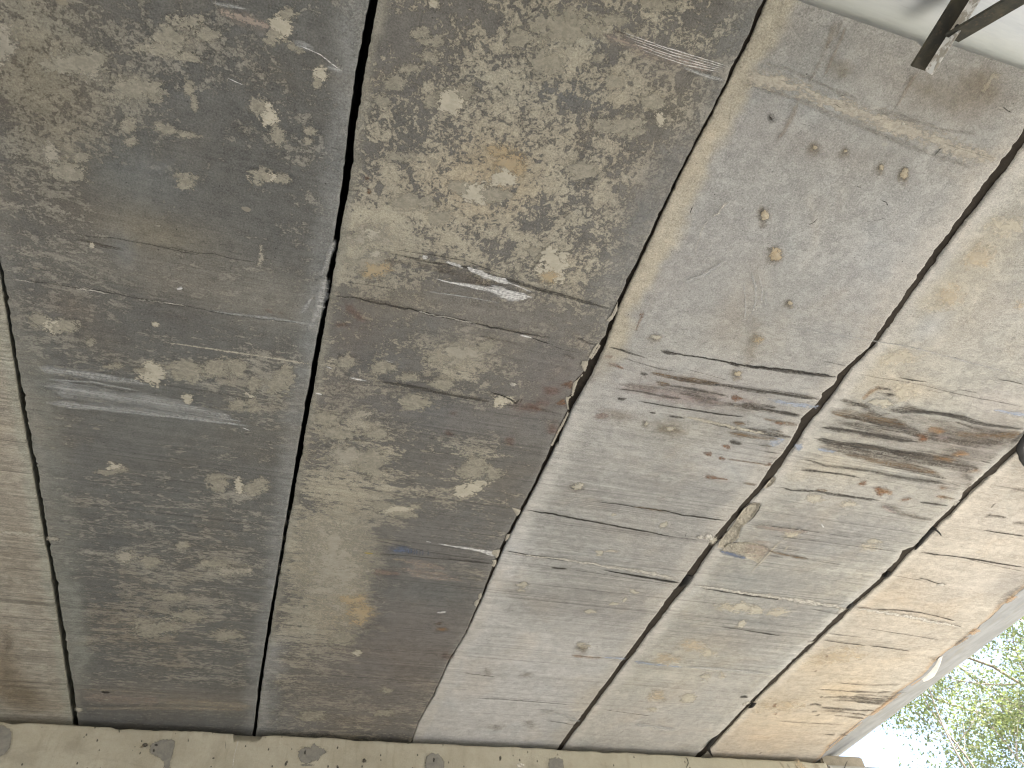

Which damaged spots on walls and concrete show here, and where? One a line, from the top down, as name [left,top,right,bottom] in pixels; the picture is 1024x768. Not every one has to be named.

crack [81,236,252,262]
water stain [381,250,608,309]
crack [337,282,545,337]
crack [661,351,840,377]
peeling [491,382,523,408]
spalling [551,343,601,446]
spalling [681,503,768,563]